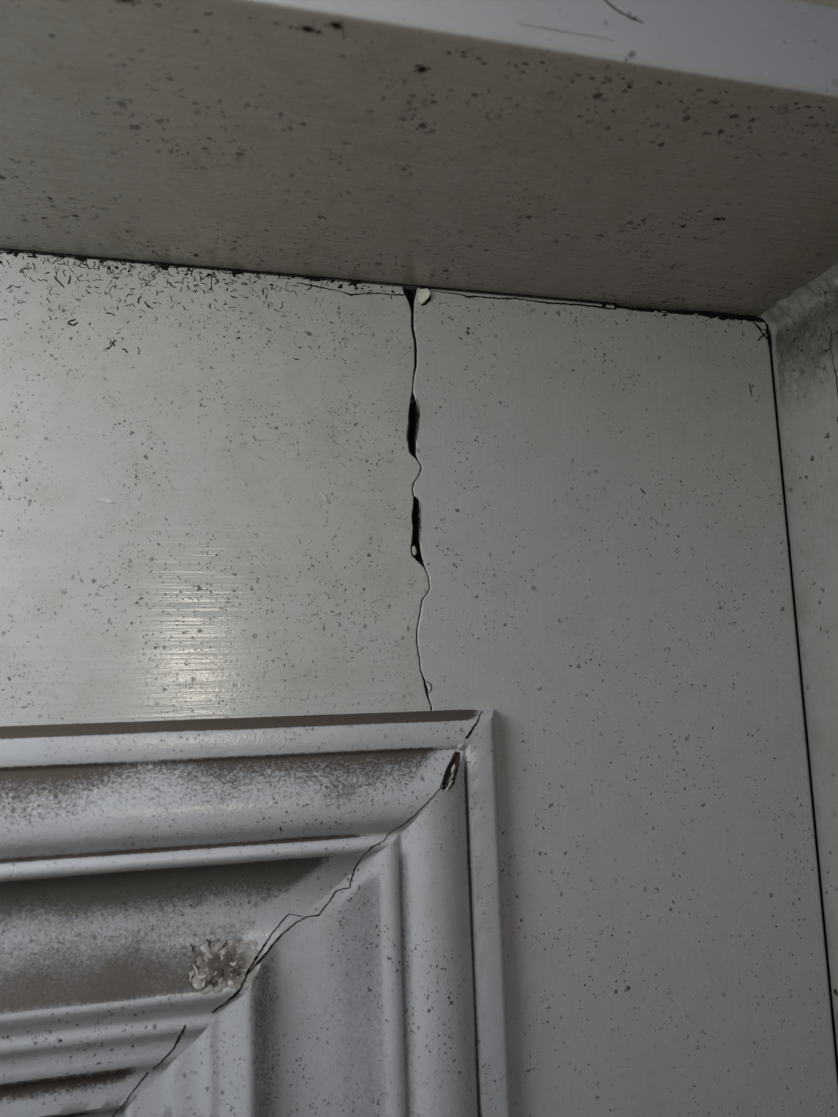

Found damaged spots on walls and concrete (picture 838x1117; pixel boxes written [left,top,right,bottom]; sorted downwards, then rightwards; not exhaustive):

crack [0,248,770,711]
crack [212,711,483,1013]
crack [112,1025,186,1117]